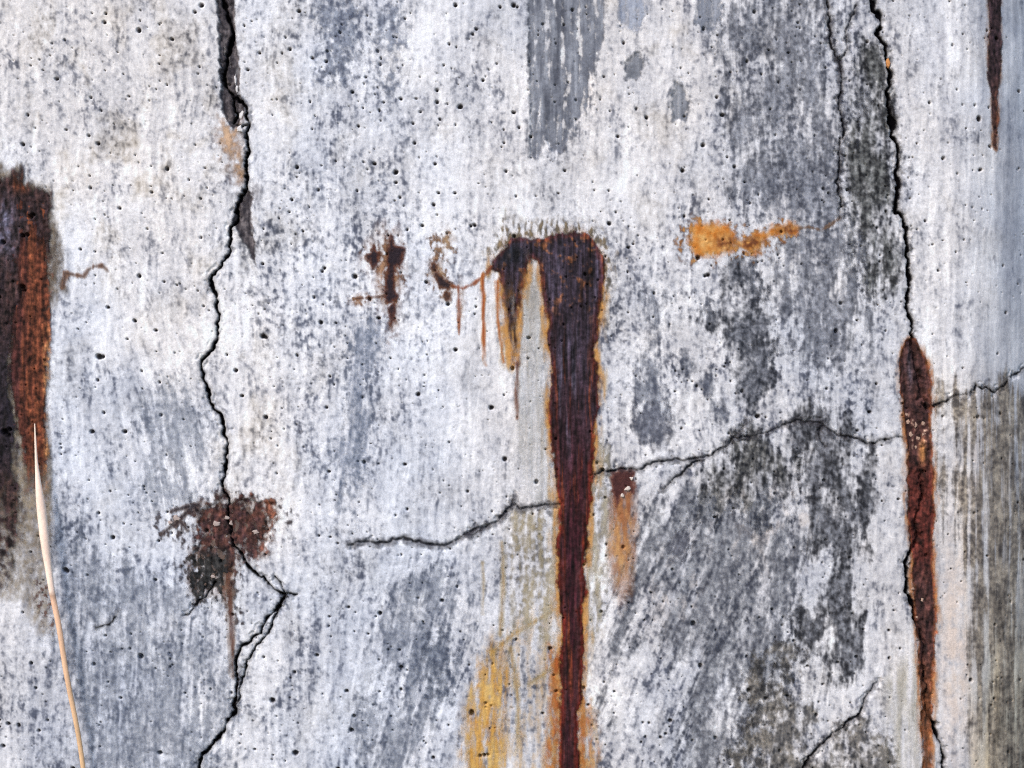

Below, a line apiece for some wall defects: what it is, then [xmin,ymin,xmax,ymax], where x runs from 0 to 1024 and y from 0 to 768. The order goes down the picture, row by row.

crack [826,0,913,338]
corrosion [987,0,1003,151]
corrosion [352,234,406,328]
corrosion [0,164,108,627]
corrosion [154,490,292,677]
crack [198,0,298,768]
crack [347,495,560,547]
corrosion [427,218,636,768]
crack [594,419,899,489]
crack [903,549,915,623]
corrosion [899,336,939,768]
crack [802,684,874,768]